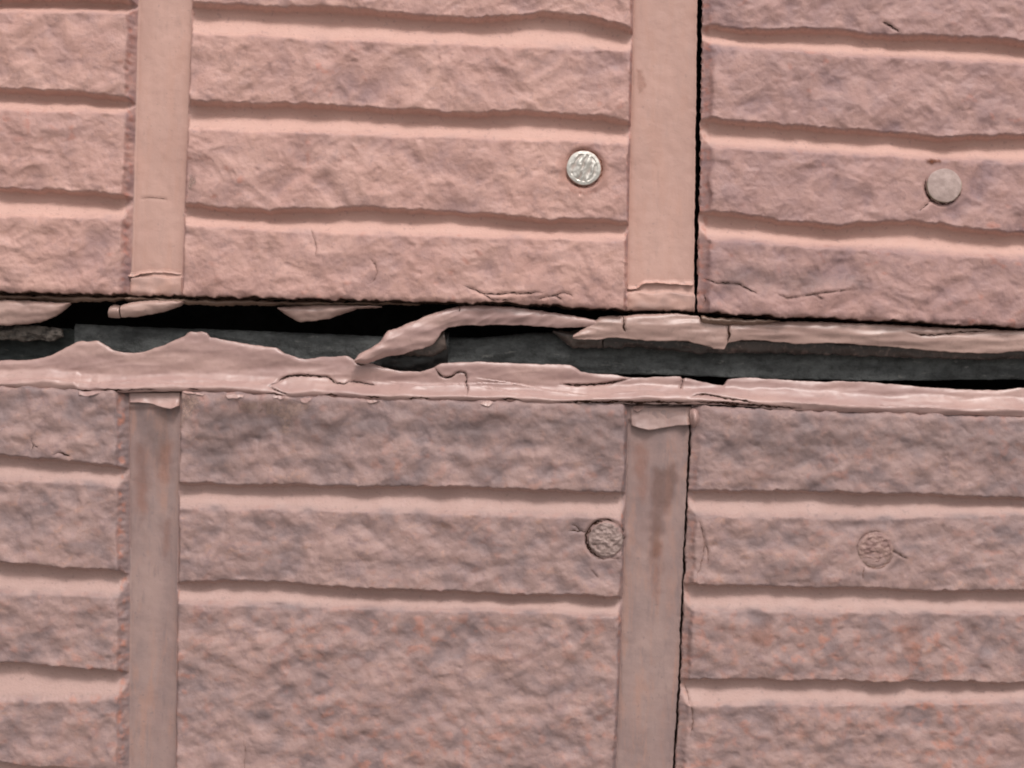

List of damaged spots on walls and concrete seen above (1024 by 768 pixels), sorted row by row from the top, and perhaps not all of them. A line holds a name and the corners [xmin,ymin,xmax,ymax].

peeling [129,391,204,426]